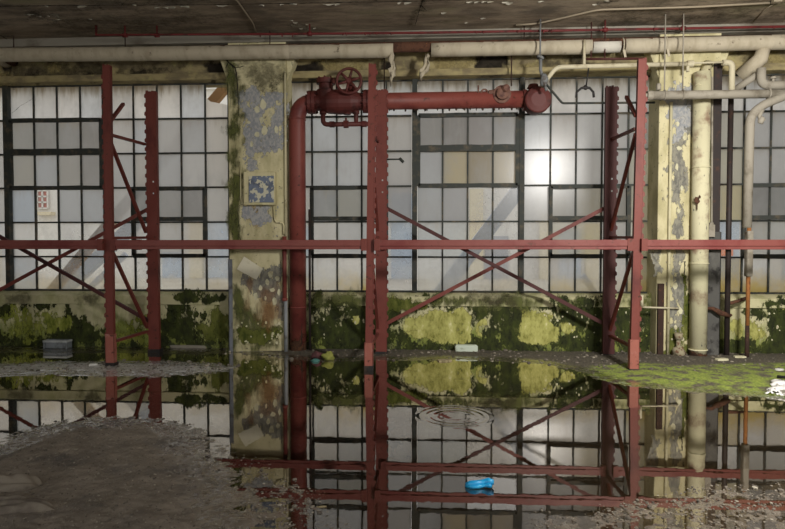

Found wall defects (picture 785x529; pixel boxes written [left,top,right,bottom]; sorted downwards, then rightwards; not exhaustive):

crack [132,1,352,9]
crack [376,0,513,24]
peeling [235,85,290,172]
peeling [663,121,692,239]
damp [0,295,106,347]
damp [161,288,226,348]
peeling [236,261,291,346]
damp [306,289,376,349]
damp [387,290,602,352]
damp [615,293,651,352]
peeling [648,239,688,341]
damp [719,295,785,354]